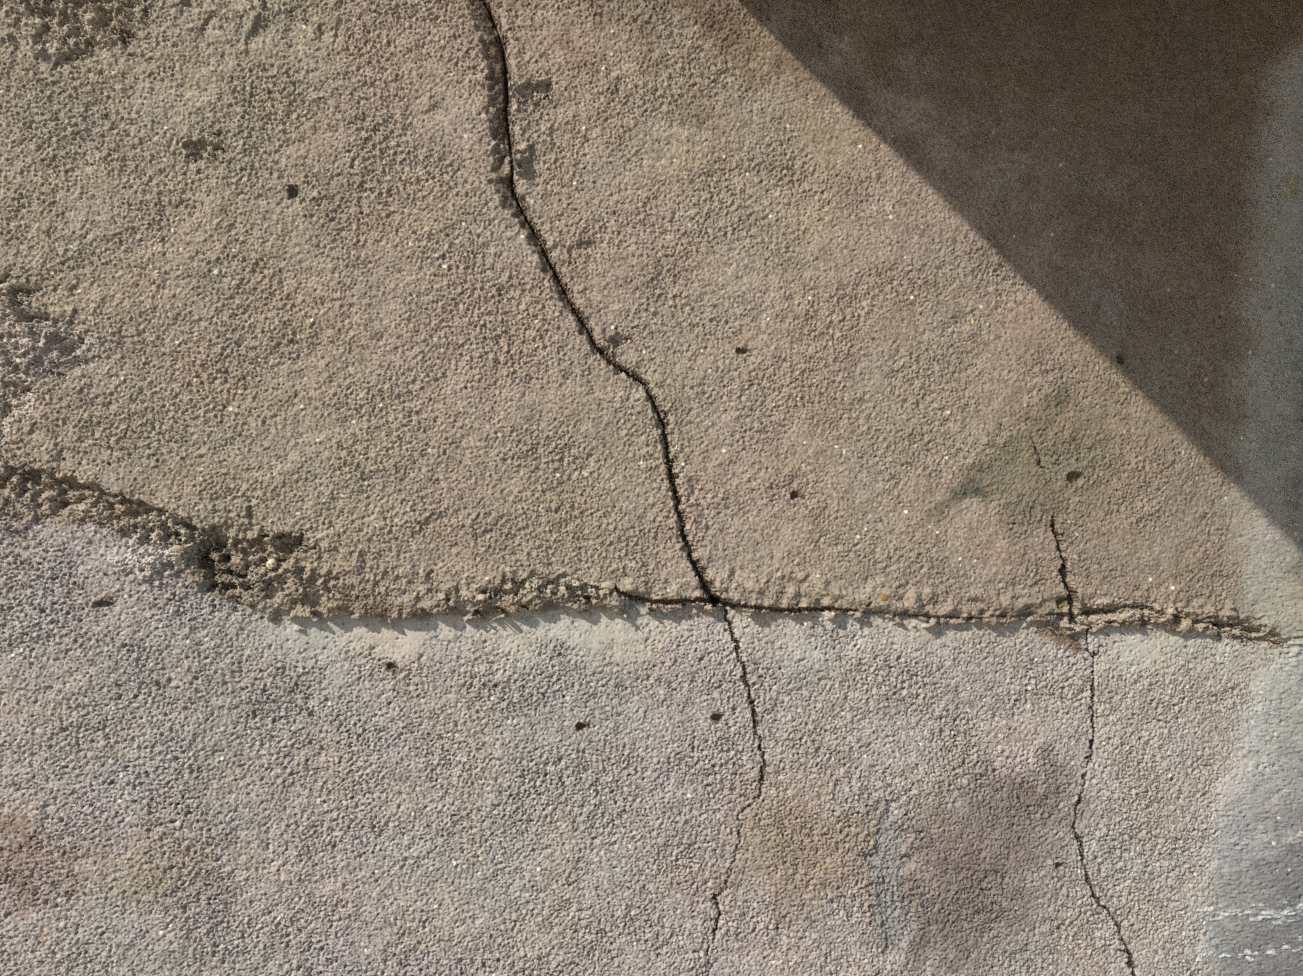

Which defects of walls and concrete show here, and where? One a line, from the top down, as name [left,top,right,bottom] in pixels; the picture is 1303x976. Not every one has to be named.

leakage [668,0,1303,311]
crack [377,0,1267,976]
leakage [936,380,1125,530]
leakage [1192,743,1303,976]